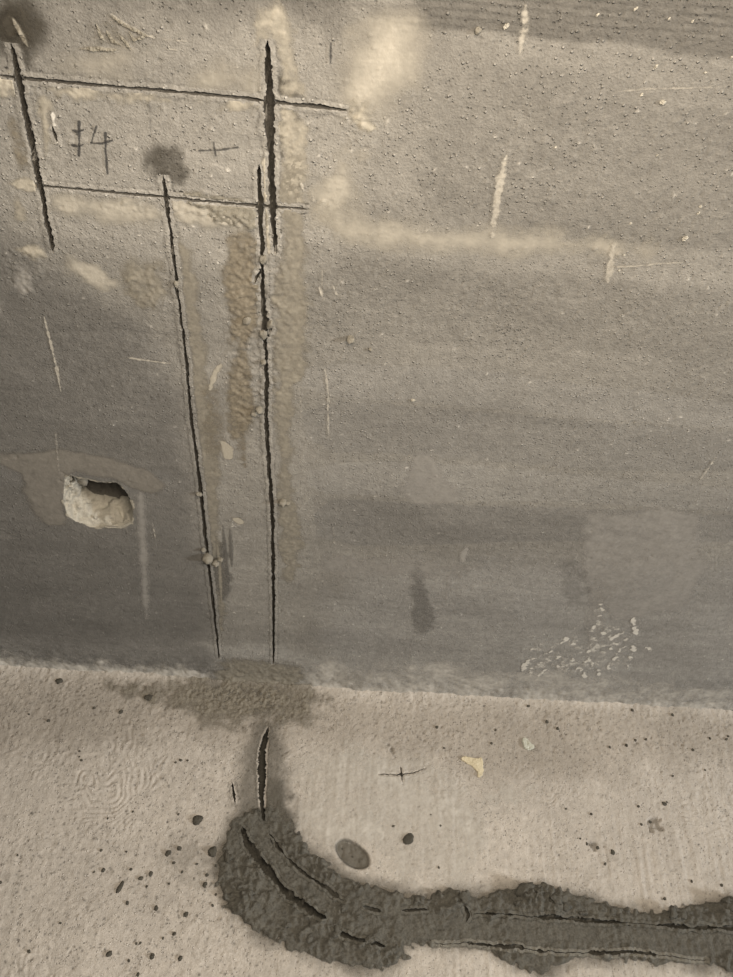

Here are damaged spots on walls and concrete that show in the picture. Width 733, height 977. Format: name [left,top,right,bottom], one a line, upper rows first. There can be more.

crack [0,39,349,664]
spalling [61,475,135,529]
leakage [367,663,733,709]
crack [228,725,429,951]
crack [431,904,733,964]